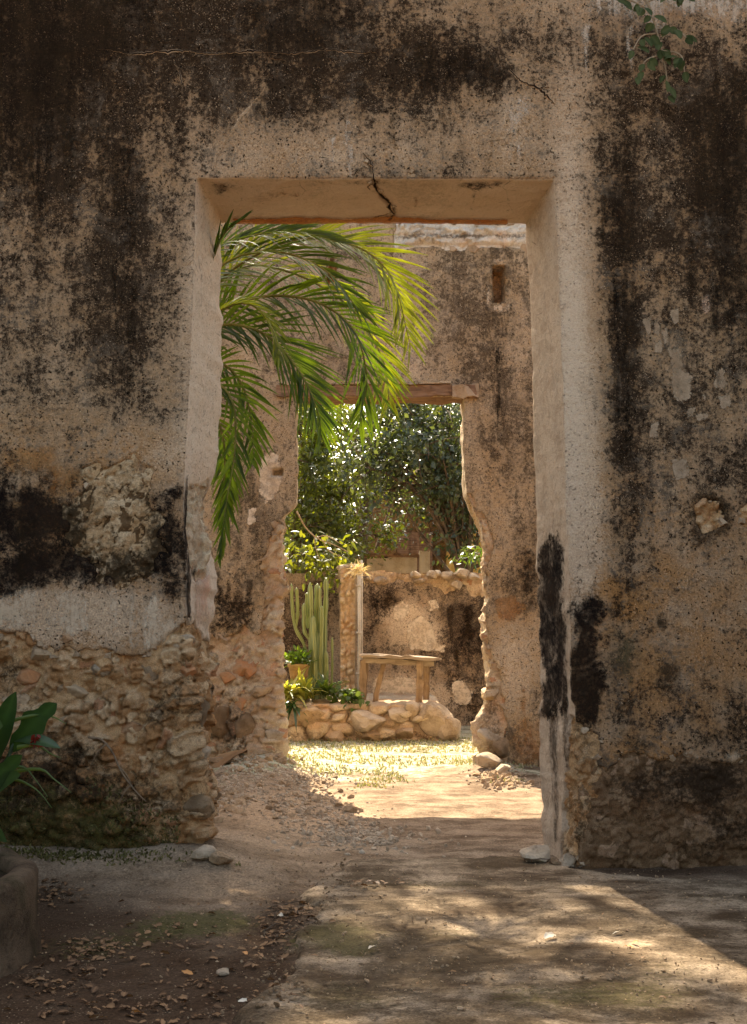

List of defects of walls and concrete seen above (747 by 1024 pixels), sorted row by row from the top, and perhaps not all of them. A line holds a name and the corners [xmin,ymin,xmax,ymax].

water stain [0,0,167,279]
crack [101,49,377,93]
crack [351,153,397,220]
crack [509,69,555,105]
water stain [686,73,747,356]
water stain [601,136,638,479]
water stain [0,521,115,599]
water stain [145,482,231,618]
water stain [687,492,733,555]
flaking render [694,498,747,533]
flaking render [0,454,292,848]
flaking render [562,717,747,870]